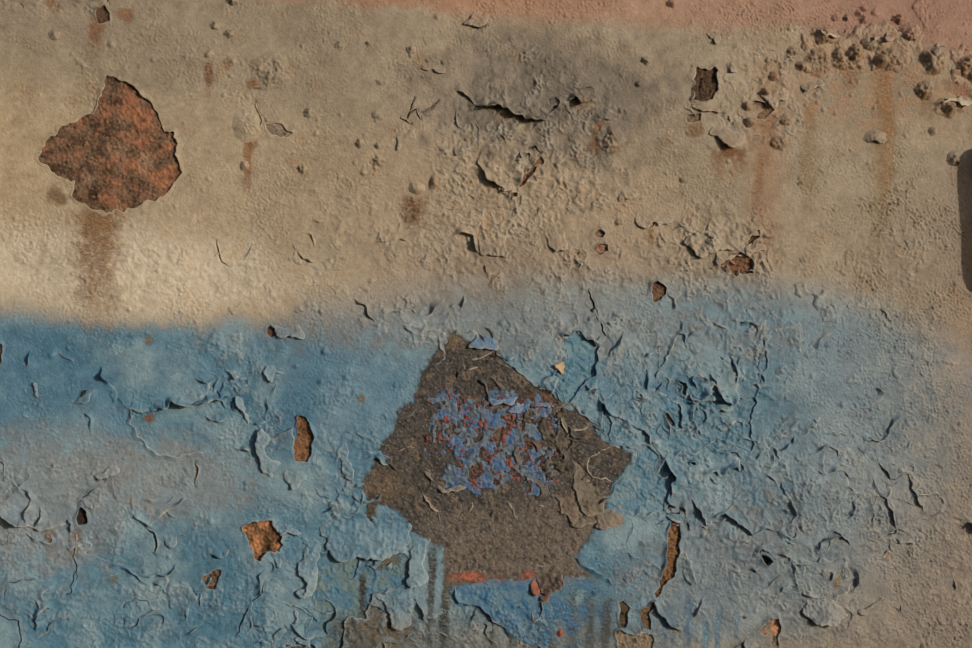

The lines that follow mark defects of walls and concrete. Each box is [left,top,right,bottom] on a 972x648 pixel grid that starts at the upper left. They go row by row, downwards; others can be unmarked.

corrosion [33,70,186,273]
peeling [264,323,305,341]
peeling [447,82,593,273]
peeling [529,191,611,271]
peeling [646,279,668,304]
peeling [683,26,804,148]
corrosion [741,70,792,150]
peeling [126,348,295,477]
peeling [389,295,925,648]
peeling [241,430,449,648]